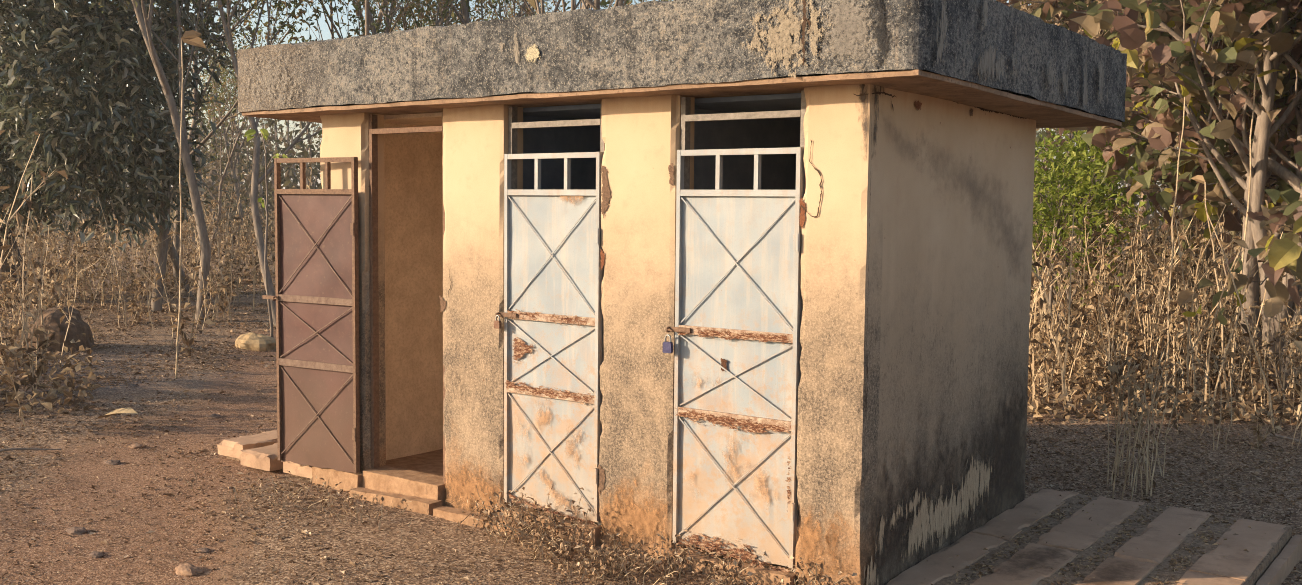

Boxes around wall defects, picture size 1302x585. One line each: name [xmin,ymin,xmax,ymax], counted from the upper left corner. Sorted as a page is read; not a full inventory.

leakage [499,31,520,64]
leakage [816,0,889,71]
leakage [936,0,949,64]
leakage [859,84,884,158]
flaking render [601,166,611,218]
crack [801,140,822,217]
rust [505,308,595,436]
rust [677,328,791,345]
rust [676,409,788,477]
rust [503,456,599,530]
leakage [863,394,1027,585]
rust [675,529,795,573]